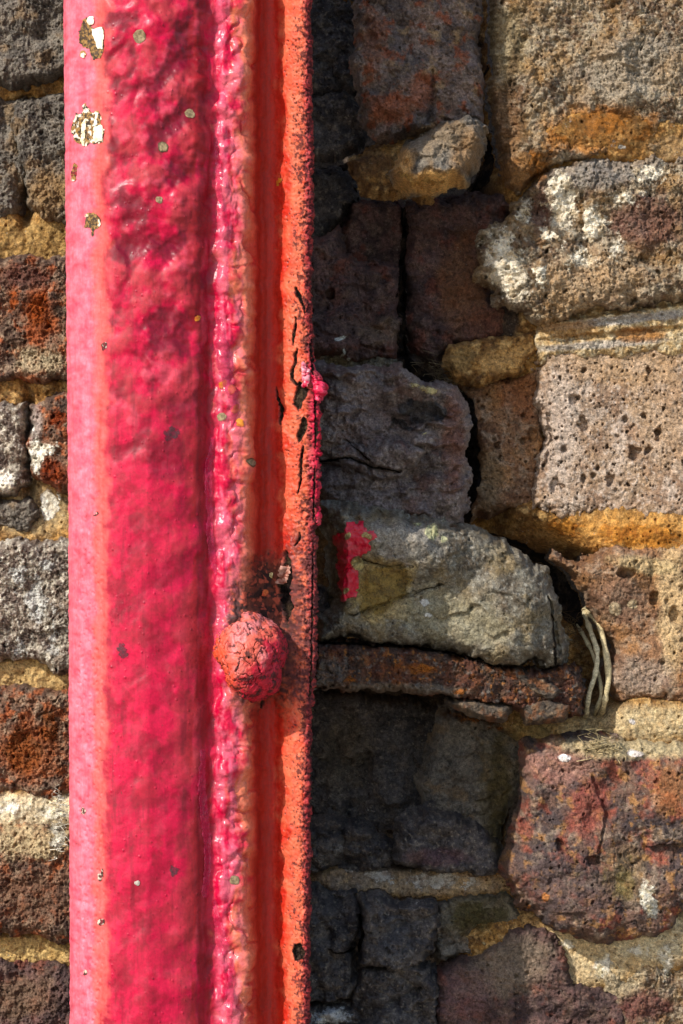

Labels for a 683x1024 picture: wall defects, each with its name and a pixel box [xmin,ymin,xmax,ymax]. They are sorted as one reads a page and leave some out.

peeling [71,103,104,146]
peeling [78,16,104,60]
crack [277,288,502,697]
crack [395,207,583,666]